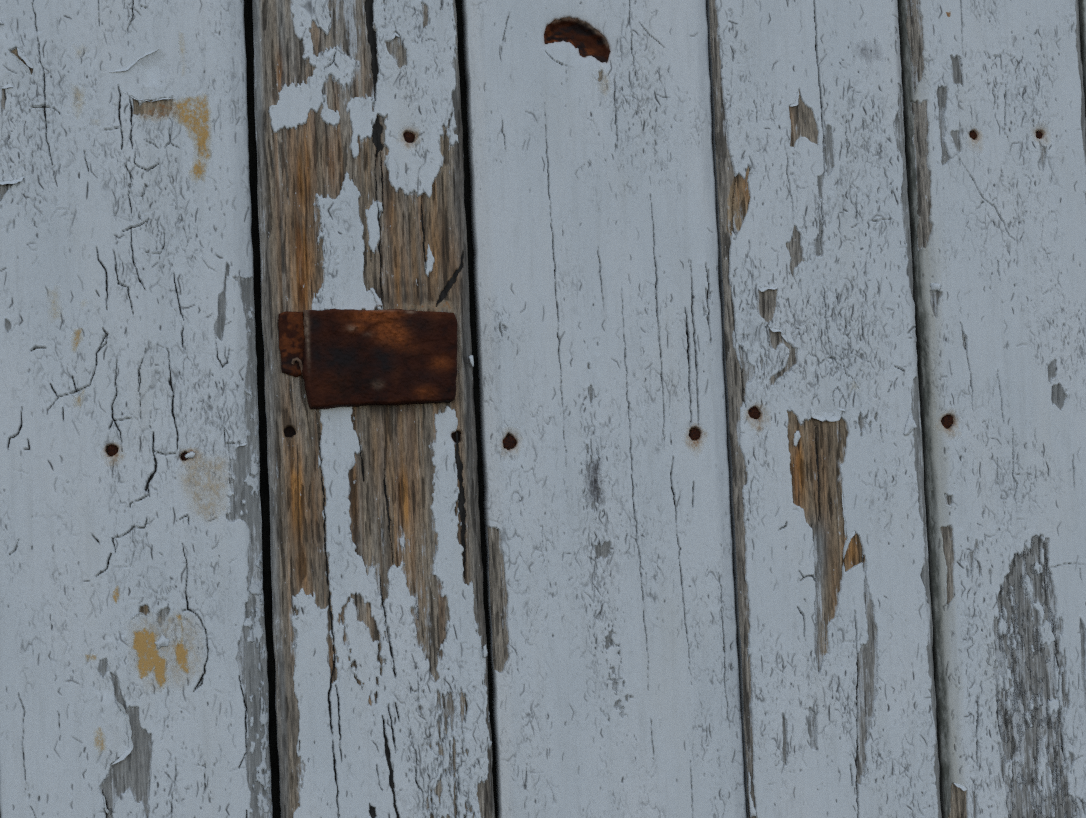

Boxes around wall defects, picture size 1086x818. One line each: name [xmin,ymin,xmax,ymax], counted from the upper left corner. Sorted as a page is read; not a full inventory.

crack [98,91,153,308]
peeling [112,49,175,116]
peeling [786,91,834,276]
crack [50,331,142,435]
crack [96,278,183,575]
peeling [214,0,509,818]
peeling [98,659,152,818]
peeling [132,605,170,649]
crack [183,548,209,690]
peeling [787,407,881,784]
peeling [904,370,976,818]
peeling [966,535,1085,818]